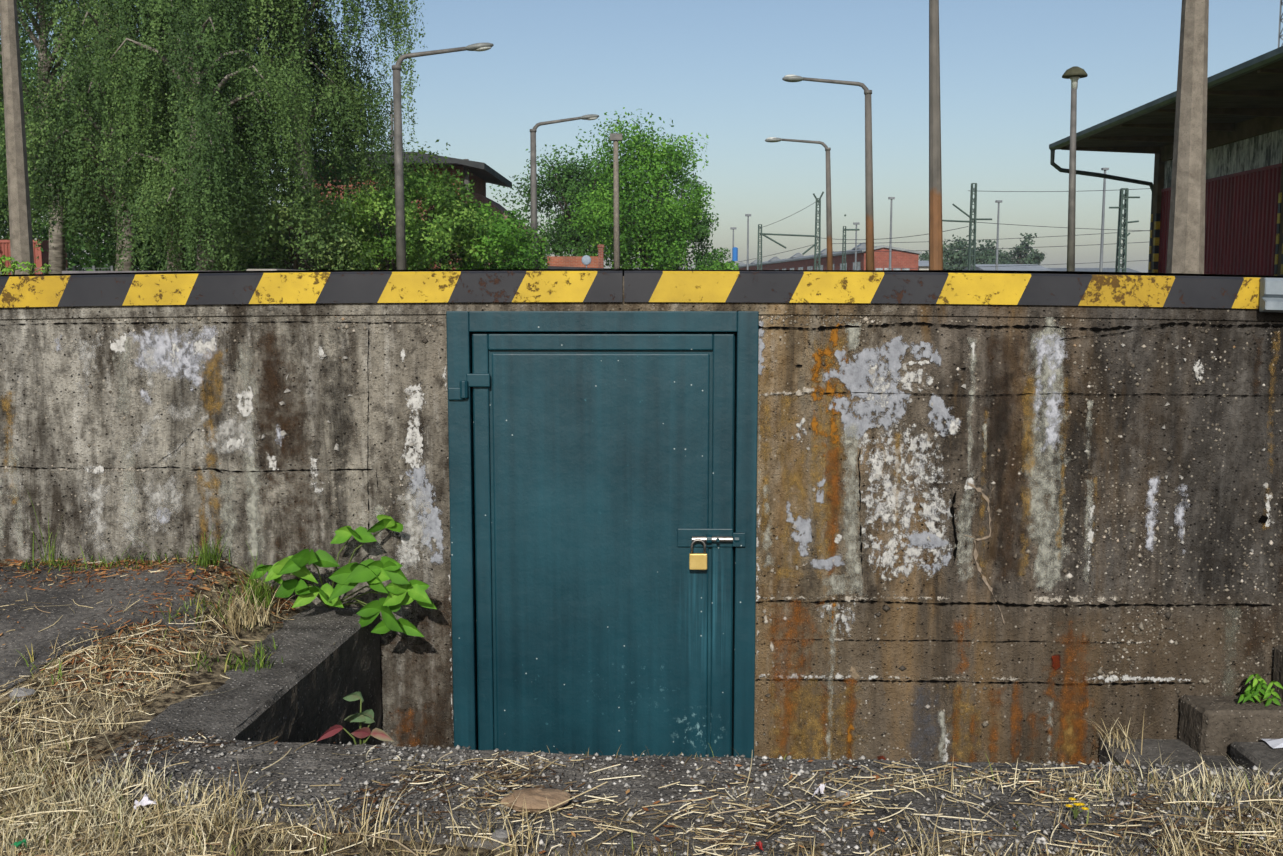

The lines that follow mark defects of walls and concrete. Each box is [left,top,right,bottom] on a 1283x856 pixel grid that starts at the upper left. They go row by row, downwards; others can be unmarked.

spalling [292,315,401,399]
leakage [971,341,1015,371]
leakage [82,328,309,557]
peeling [358,317,447,568]
rust [784,323,847,573]
leakage [958,478,974,572]
peeling [759,314,1283,760]
leakage [996,317,1067,589]
leakage [1085,478,1097,571]
rust [772,607,860,760]
rust [990,632,1088,765]